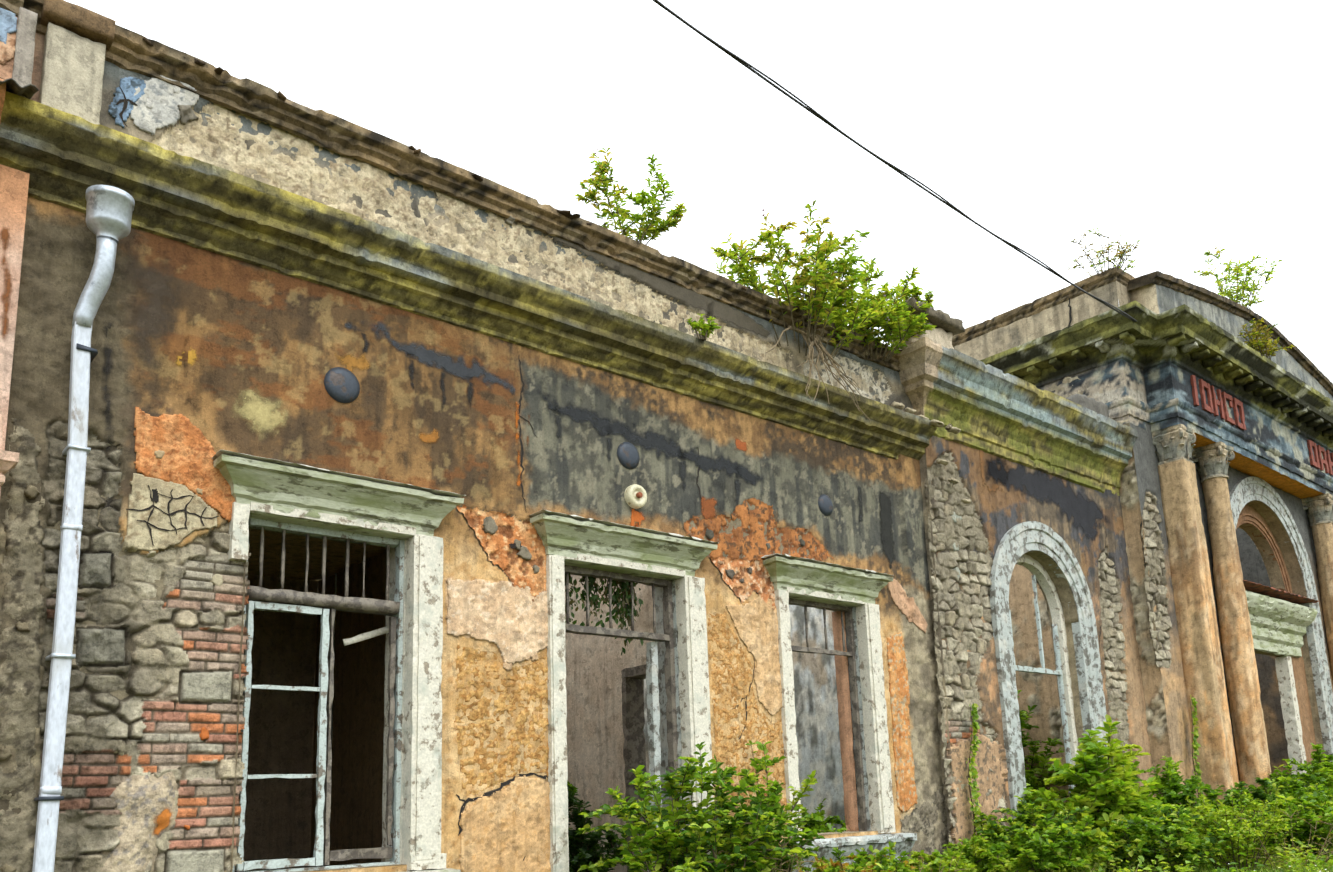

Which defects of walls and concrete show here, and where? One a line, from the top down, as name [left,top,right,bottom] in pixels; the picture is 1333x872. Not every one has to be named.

leakage [0,227,12,336]
flaking render [0,418,68,872]
leakage [103,324,112,473]
flaking render [54,407,251,872]
crack [126,485,219,545]
leakage [176,349,197,367]
flaking render [446,504,551,872]
crack [456,773,548,836]
flaking render [108,75,961,434]
leakage [501,216,770,337]
flaking render [684,498,834,806]
flaking render [887,451,1008,865]